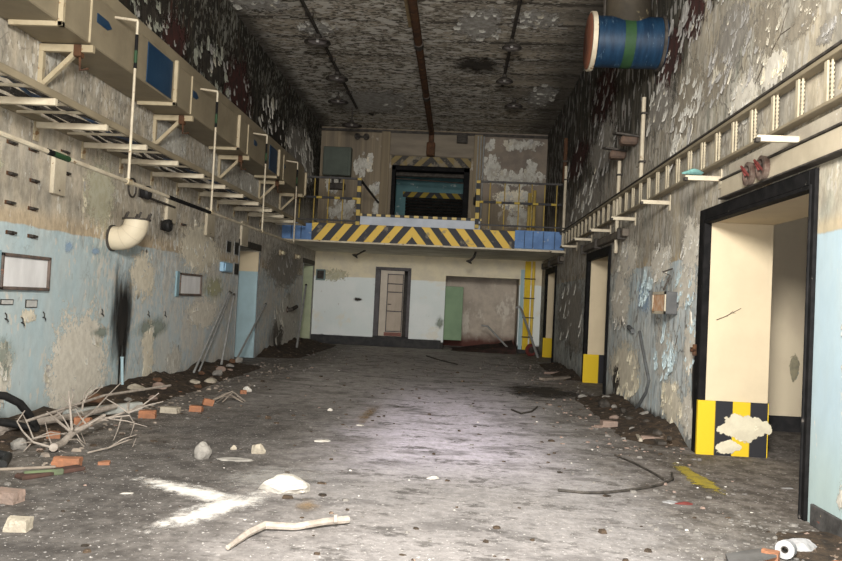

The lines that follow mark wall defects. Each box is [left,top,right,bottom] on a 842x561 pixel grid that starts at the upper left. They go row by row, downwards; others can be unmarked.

water stain [456,57,501,72]
peeling [353,152,380,214]
peeling [481,138,546,230]
peeling [43,294,112,409]
peeling [608,215,700,441]